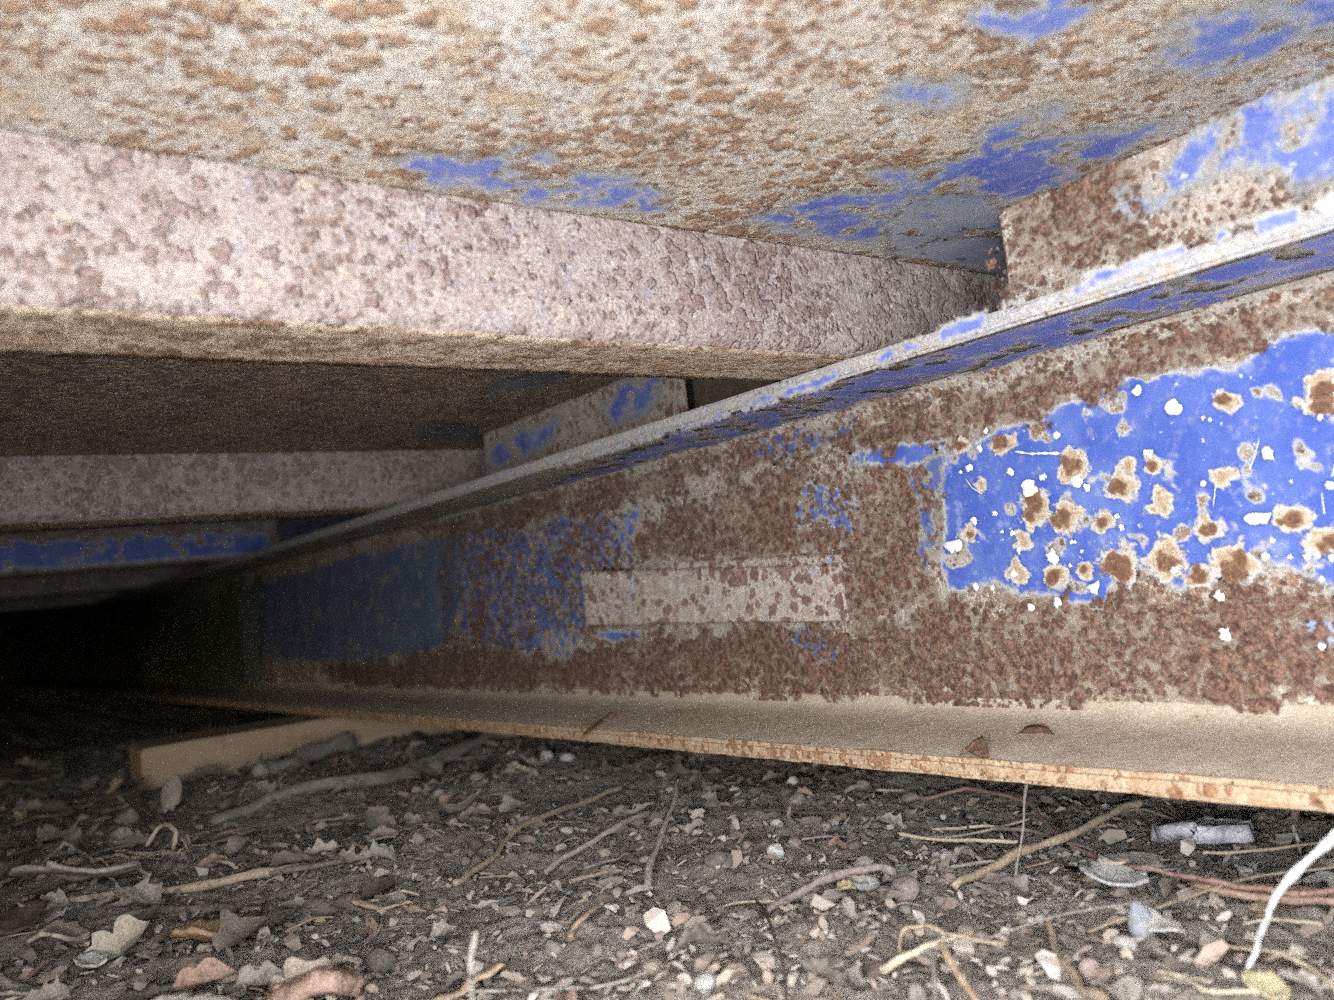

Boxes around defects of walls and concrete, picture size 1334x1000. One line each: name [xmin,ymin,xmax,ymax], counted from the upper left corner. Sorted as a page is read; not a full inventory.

peeling [966,0,1114,45]
peeling [1153,0,1334,78]
peeling [392,143,674,215]
rust [986,157,1158,299]
peeling [551,76,1334,611]
peeling [486,417,560,470]
peeling [0,513,371,573]
rust [321,279,1334,738]
peeling [244,506,642,666]
rust [957,736,989,758]